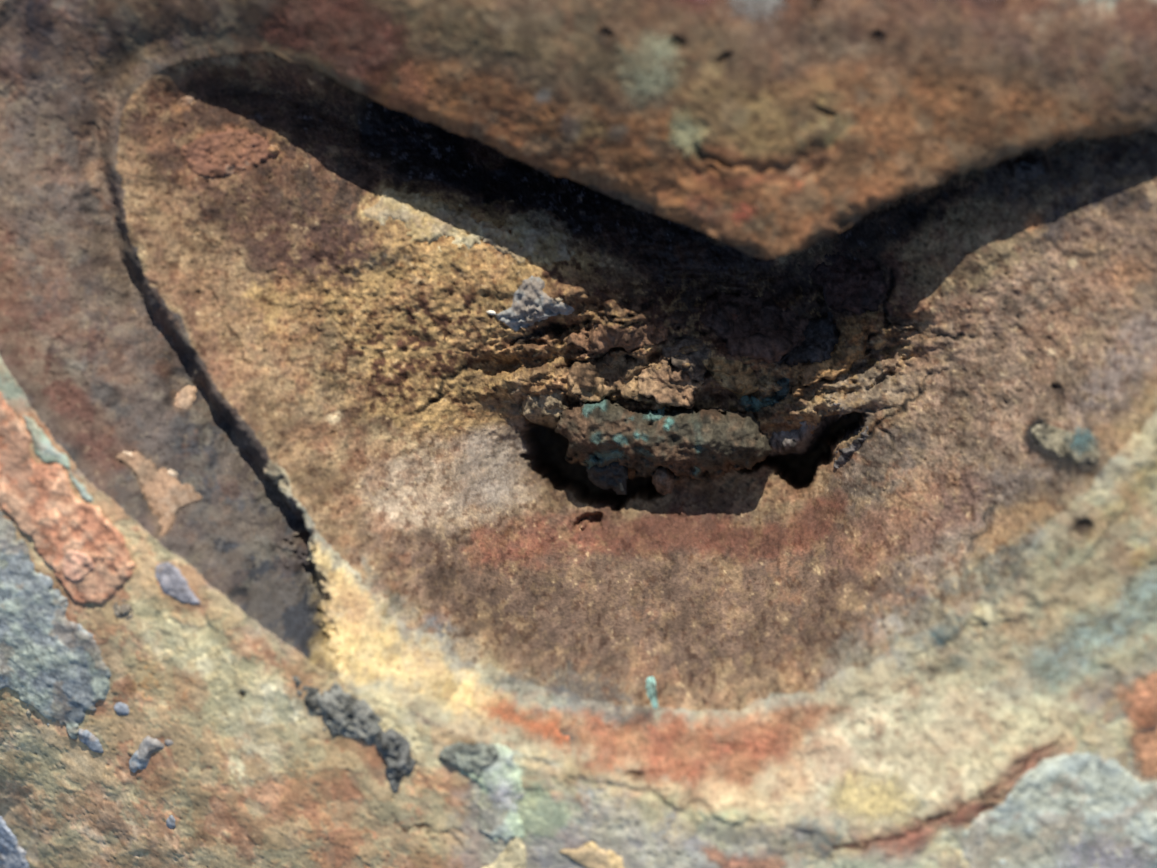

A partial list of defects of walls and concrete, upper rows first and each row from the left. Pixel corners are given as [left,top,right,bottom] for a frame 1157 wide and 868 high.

water stain [732,0,782,17]
rust [265,0,423,92]
water stain [635,42,676,93]
water stain [673,120,700,151]
water stain [741,377,790,412]
peeling [22,414,94,502]
water stain [467,439,513,502]
peeling [155,562,200,604]
peeling [0,511,129,753]
water stain [1037,575,1157,675]
water stain [646,676,659,709]